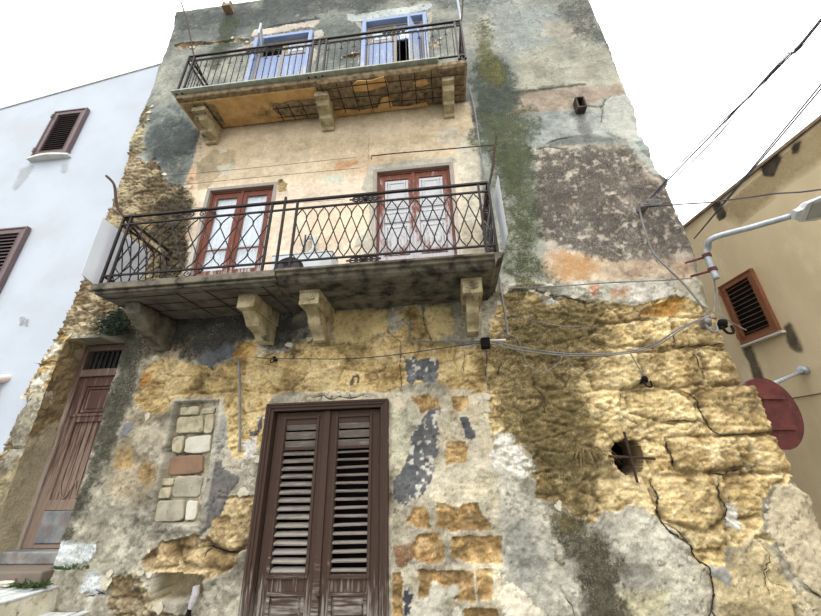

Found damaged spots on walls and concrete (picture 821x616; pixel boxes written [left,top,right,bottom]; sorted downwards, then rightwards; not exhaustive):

damp [468,58,522,122]
spalling [105,104,196,280]
damp [143,116,201,278]
damp [713,127,821,221]
spalling [20,276,250,400]
crack [673,336,724,379]
spalling [100,487,254,616]
spalling [134,284,793,616]
damp [551,513,633,616]
crack [649,481,716,616]
crack [663,390,768,467]
crack [710,469,744,520]